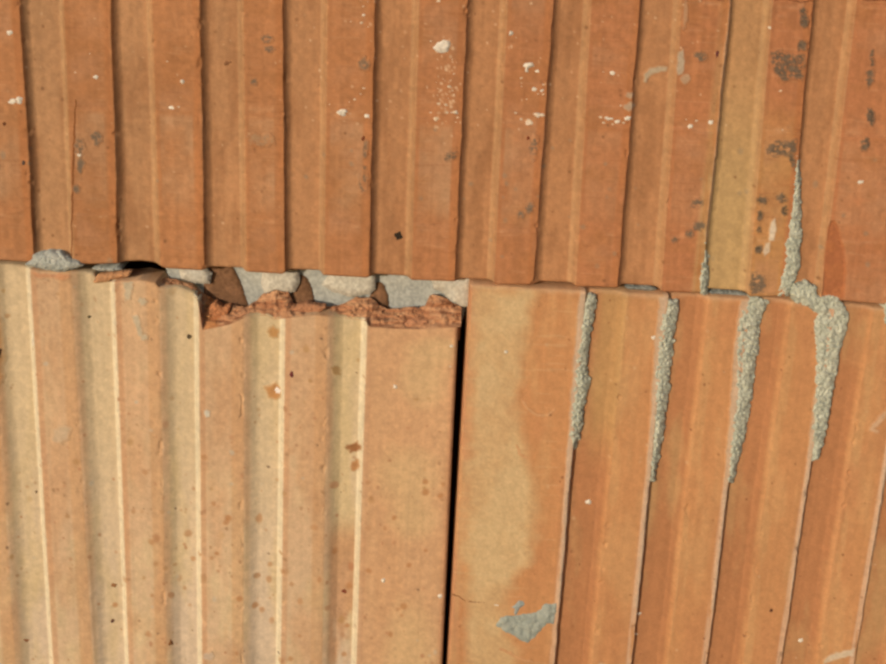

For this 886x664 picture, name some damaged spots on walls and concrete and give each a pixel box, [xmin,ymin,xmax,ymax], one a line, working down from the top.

spalling [93,269,462,341]